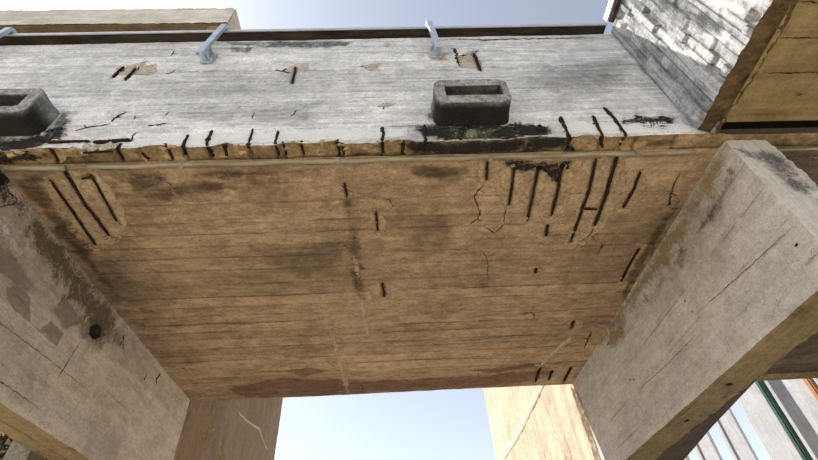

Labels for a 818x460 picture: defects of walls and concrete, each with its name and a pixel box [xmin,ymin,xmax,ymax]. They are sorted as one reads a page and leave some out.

spalling [0,0,818,251]
damp [398,113,574,183]
damp [622,114,677,129]
damp [0,112,95,267]
crack [471,185,507,234]